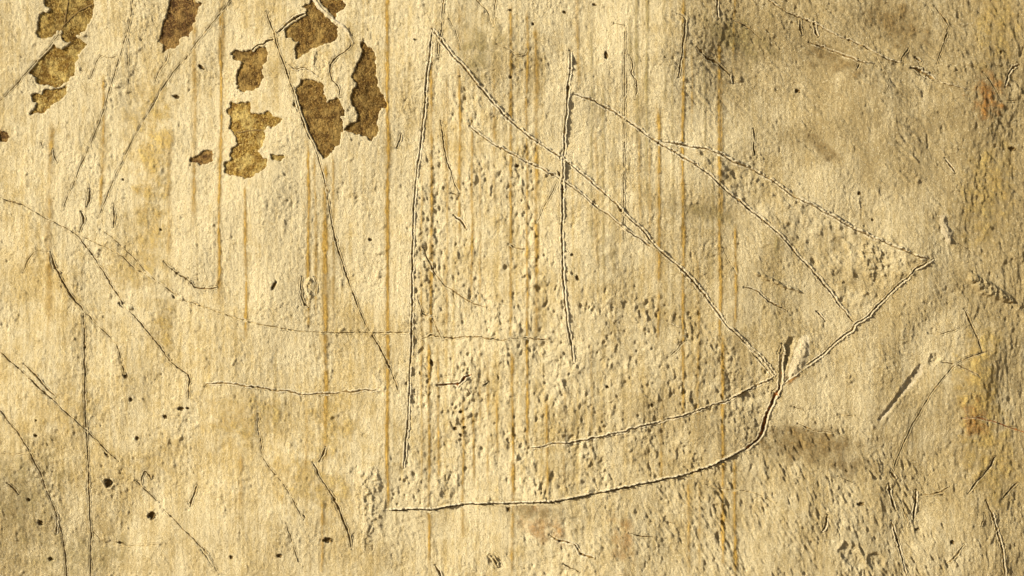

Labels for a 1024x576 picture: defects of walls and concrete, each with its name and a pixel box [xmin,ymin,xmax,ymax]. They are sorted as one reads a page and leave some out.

peeling [29,0,94,115]
crack [0,250,219,576]
peeling [159,0,202,52]
peeling [190,47,285,179]
crack [0,0,550,398]
rust [306,151,334,452]
peeling [285,0,387,159]
rust [420,139,439,486]
rust [510,135,538,535]
crack [614,22,639,238]
crack [677,12,736,83]
rust [717,0,737,568]